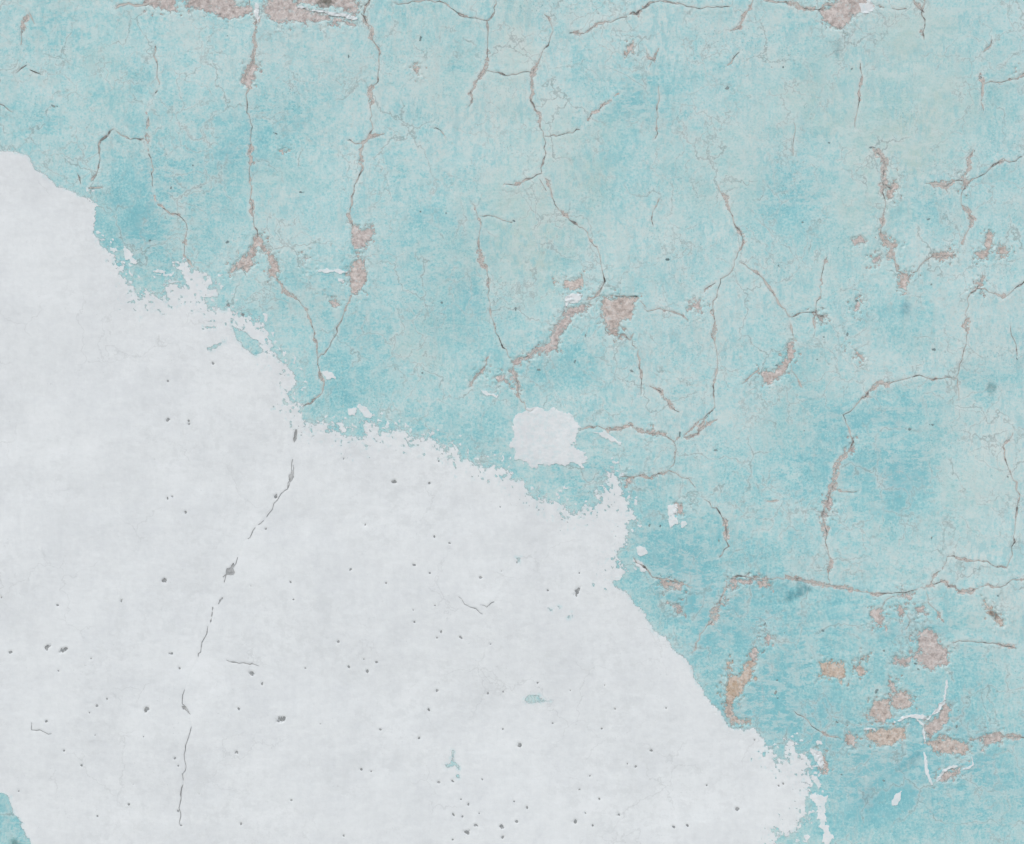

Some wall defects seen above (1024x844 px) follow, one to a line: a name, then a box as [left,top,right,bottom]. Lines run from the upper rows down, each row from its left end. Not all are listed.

crack [77,46,193,267]
crack [241,16,260,237]
peeling [143,0,361,31]
crack [346,0,384,228]
peeling [819,0,881,34]
peeling [342,224,376,296]
peeling [469,271,642,391]
crack [395,0,1024,653]
crack [198,279,352,654]
crack [179,689,191,824]
peeling [717,626,774,728]
peeling [845,589,1003,785]